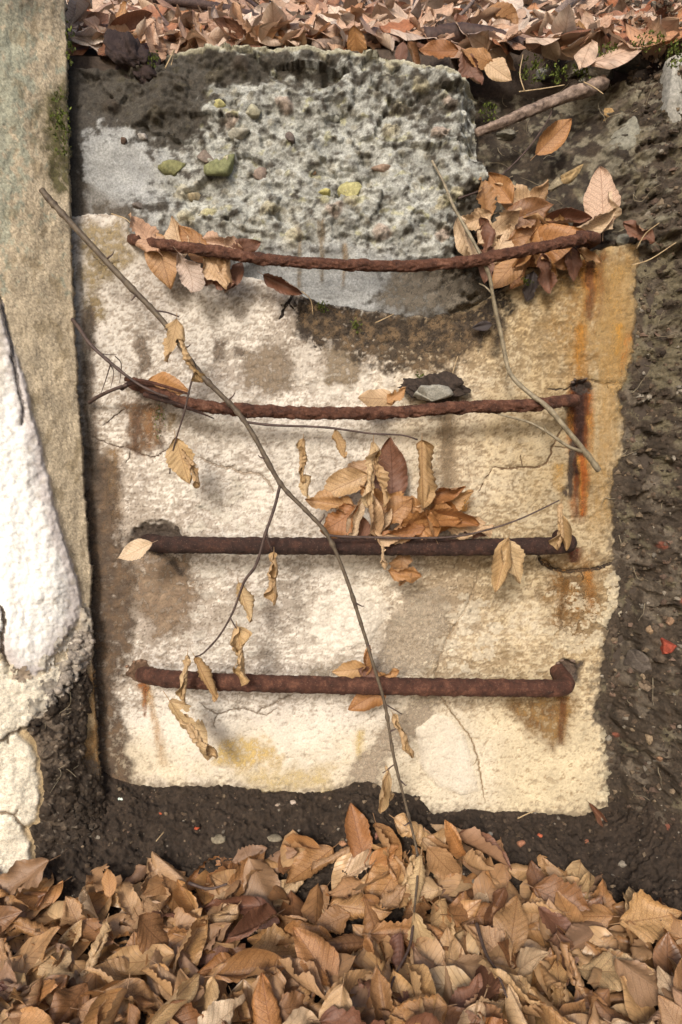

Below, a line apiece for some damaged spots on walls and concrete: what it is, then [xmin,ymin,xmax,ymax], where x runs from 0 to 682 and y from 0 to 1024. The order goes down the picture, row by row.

spalling [67,42,506,318]
rust [119,377,214,454]
peeling [288,338,396,400]
spalling [570,377,593,395]
rust [556,253,628,516]
crack [479,429,569,491]
crack [537,555,612,581]
peeling [182,566,267,663]
peeling [392,592,504,675]
peeling [542,570,622,677]
crack [435,559,485,799]
rust [508,696,576,748]